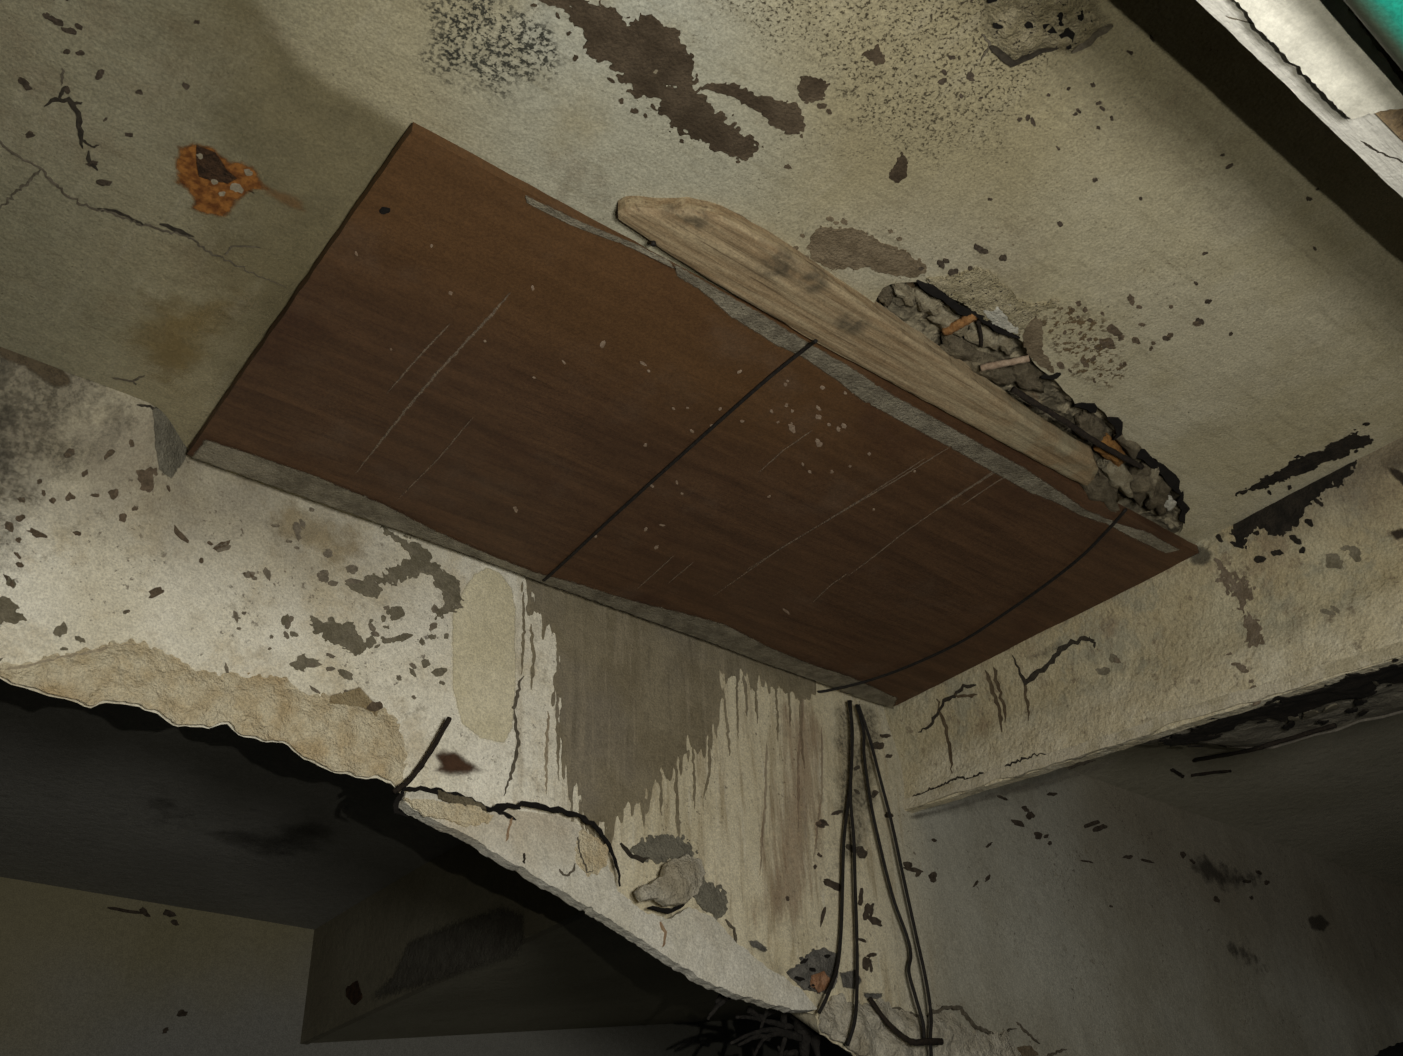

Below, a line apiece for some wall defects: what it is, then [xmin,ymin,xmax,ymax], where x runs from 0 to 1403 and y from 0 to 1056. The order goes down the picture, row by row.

crack [44,68,99,171]
crack [0,140,287,288]
rust [176,144,267,216]
mould [425,0,557,94]
mould [0,347,96,501]
spalling [793,216,1190,534]
peeling [0,497,47,625]
spalling [1159,422,1403,778]
crack [393,676,621,887]
spalling [0,525,1038,1056]
water stain [514,572,824,876]
crack [913,636,1096,796]